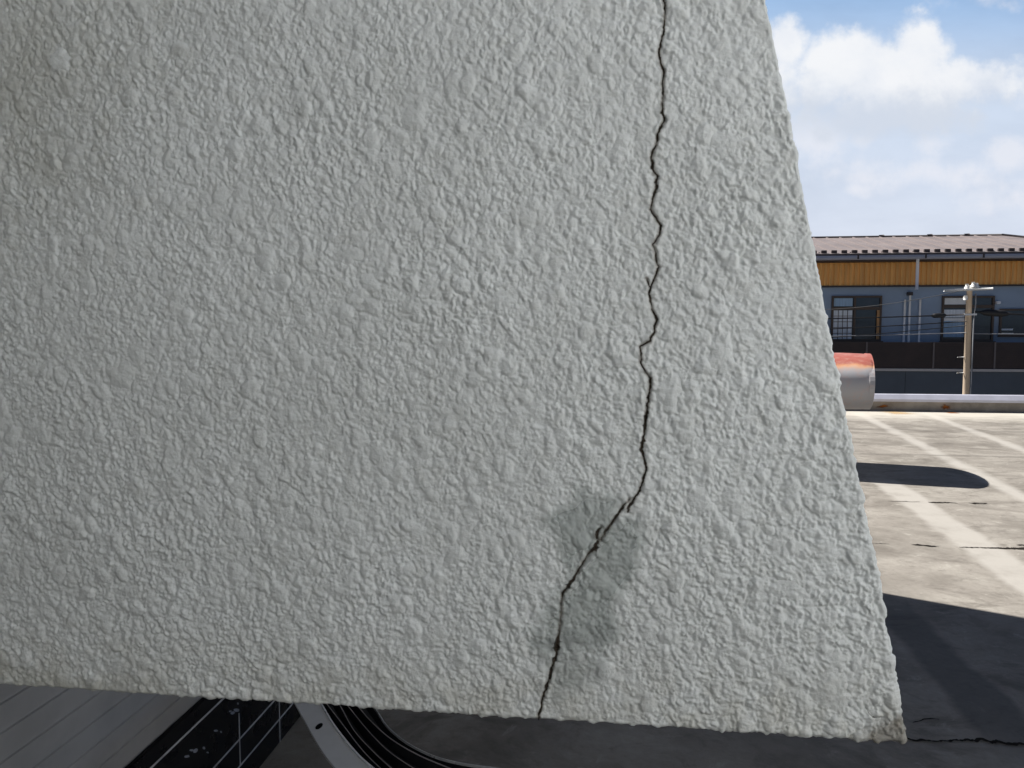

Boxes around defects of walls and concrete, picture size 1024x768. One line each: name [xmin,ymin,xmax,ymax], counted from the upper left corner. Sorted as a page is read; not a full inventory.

crack [538,0,666,720]